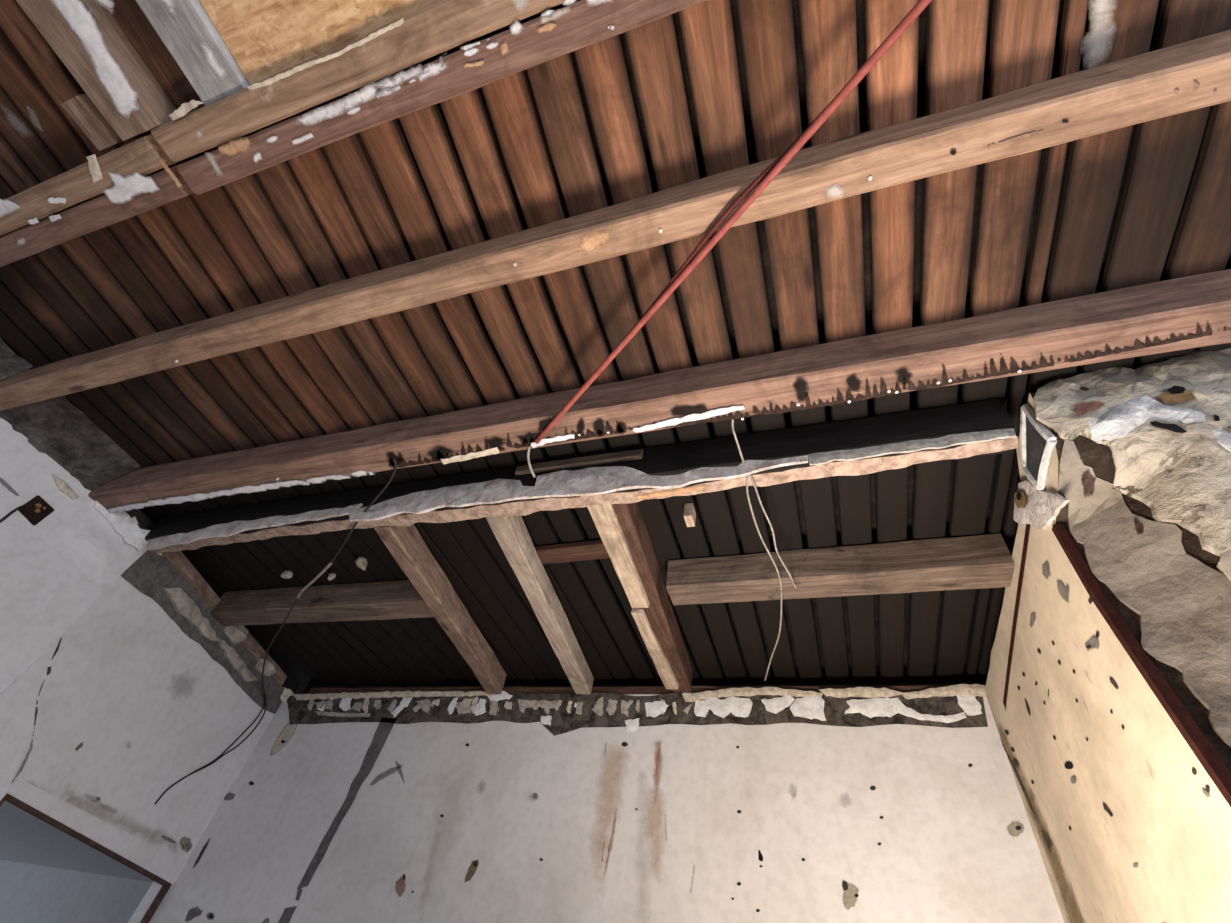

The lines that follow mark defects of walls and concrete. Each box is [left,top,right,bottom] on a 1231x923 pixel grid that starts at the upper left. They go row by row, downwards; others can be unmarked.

crack [12,638,62,782]
flaking render [52,475,80,500]
crack [371,762,404,785]
peeling [93,501,988,755]
leakage [999,728,1083,923]
flaking render [1014,348,1231,747]